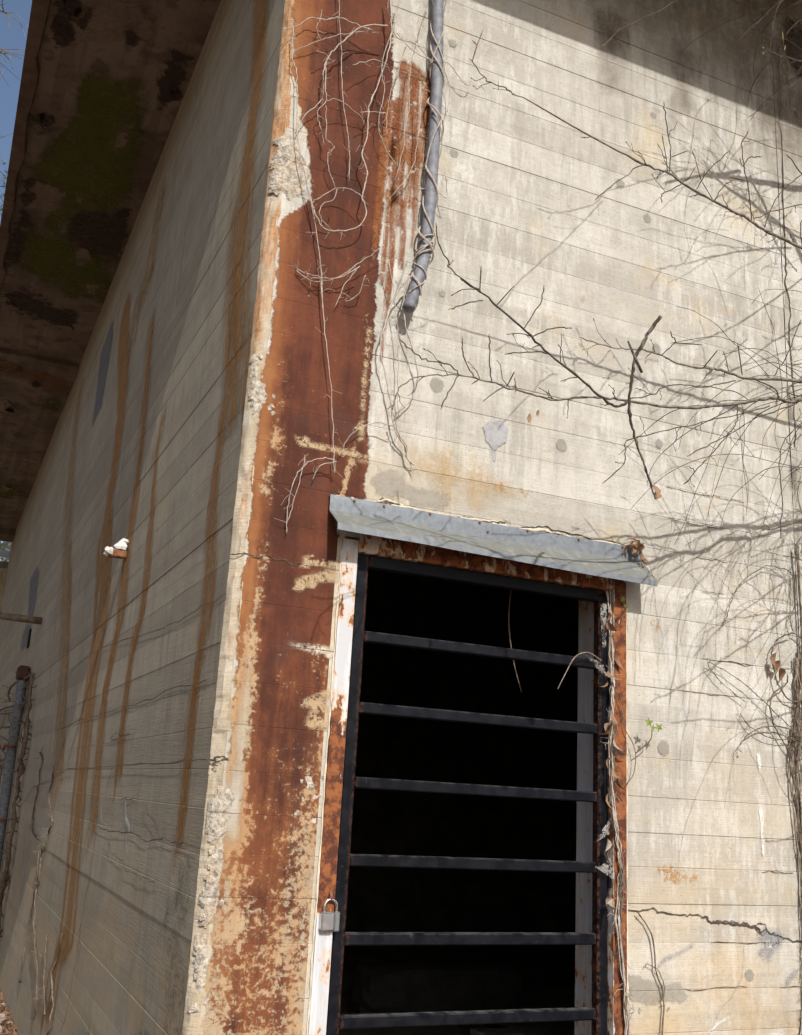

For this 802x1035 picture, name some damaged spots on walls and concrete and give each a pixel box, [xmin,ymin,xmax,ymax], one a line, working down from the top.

spalling [155,49,195,111]
damp [781,0,802,126]
damp [92,320,113,424]
corrosion [174,0,268,866]
spalling [164,0,309,1035]
crack [230,546,301,565]
corrosion [203,0,431,1035]
corrosion [41,295,166,1028]
peeling [296,645,333,658]
peeling [301,690,330,730]
spalling [294,774,324,816]
crack [603,905,802,949]